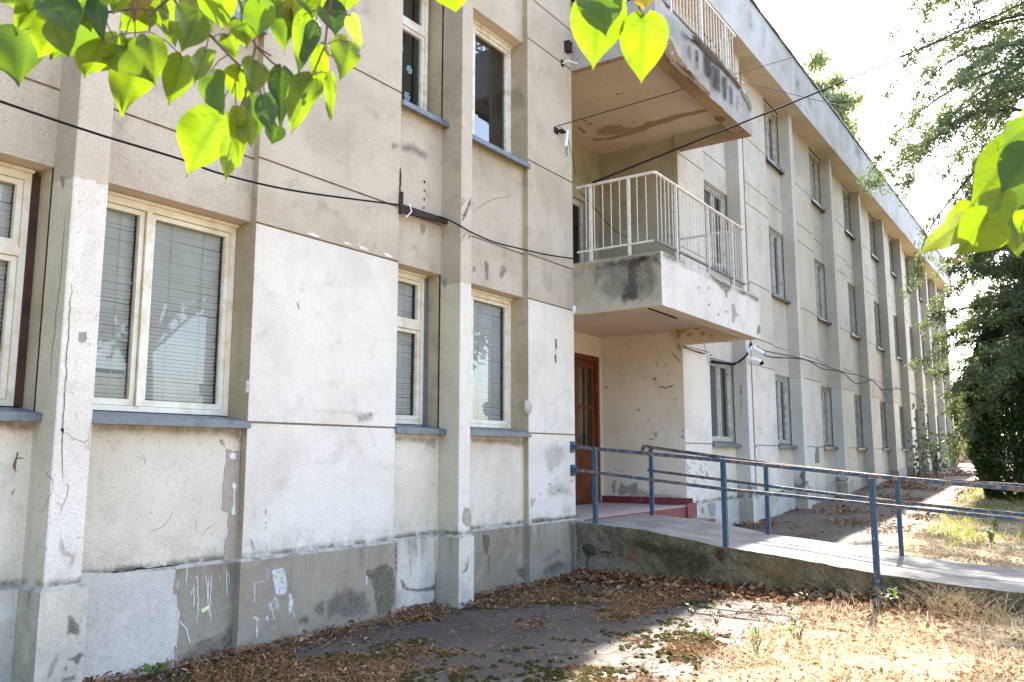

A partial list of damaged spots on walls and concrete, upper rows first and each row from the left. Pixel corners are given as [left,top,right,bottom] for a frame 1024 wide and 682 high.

leakage [682,32,738,107]
leakage [582,256,658,300]
crack [41,224,93,514]
peeling [220,440,240,560]
leakage [317,565,394,613]